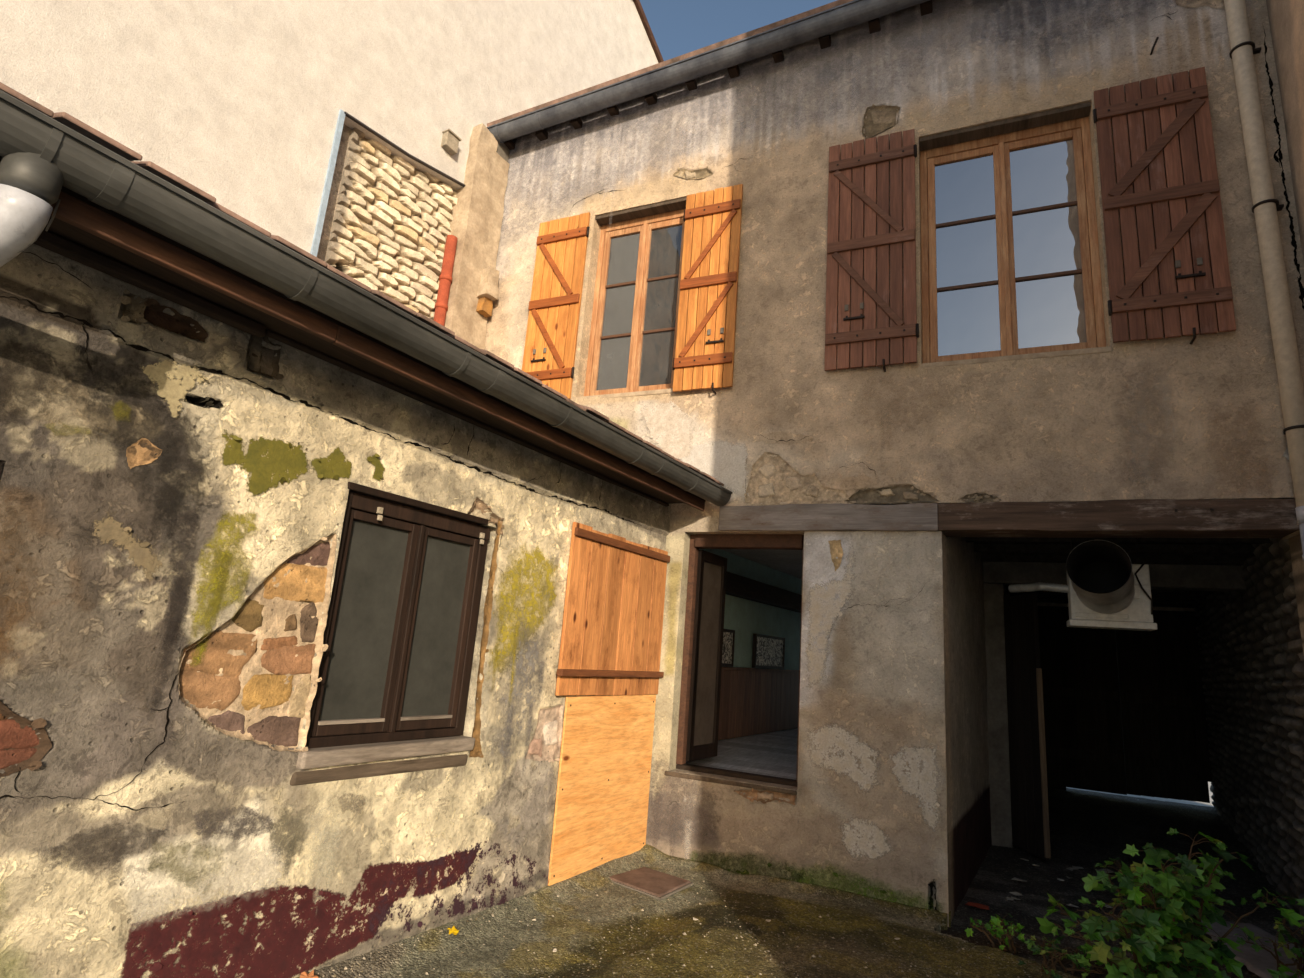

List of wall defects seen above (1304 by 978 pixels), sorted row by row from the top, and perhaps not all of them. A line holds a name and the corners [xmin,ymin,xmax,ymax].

spalling [862,104,900,139]
crack [1263,28,1304,309]
damp [0,339,210,667]
crack [0,252,642,526]
spalling [640,401,939,506]
damp [196,549,247,663]
spalling [178,533,336,752]
spalling [0,701,52,777]
crack [0,630,189,811]
peeling [838,817,893,860]
peeling [806,724,941,829]
peeling [121,841,547,978]